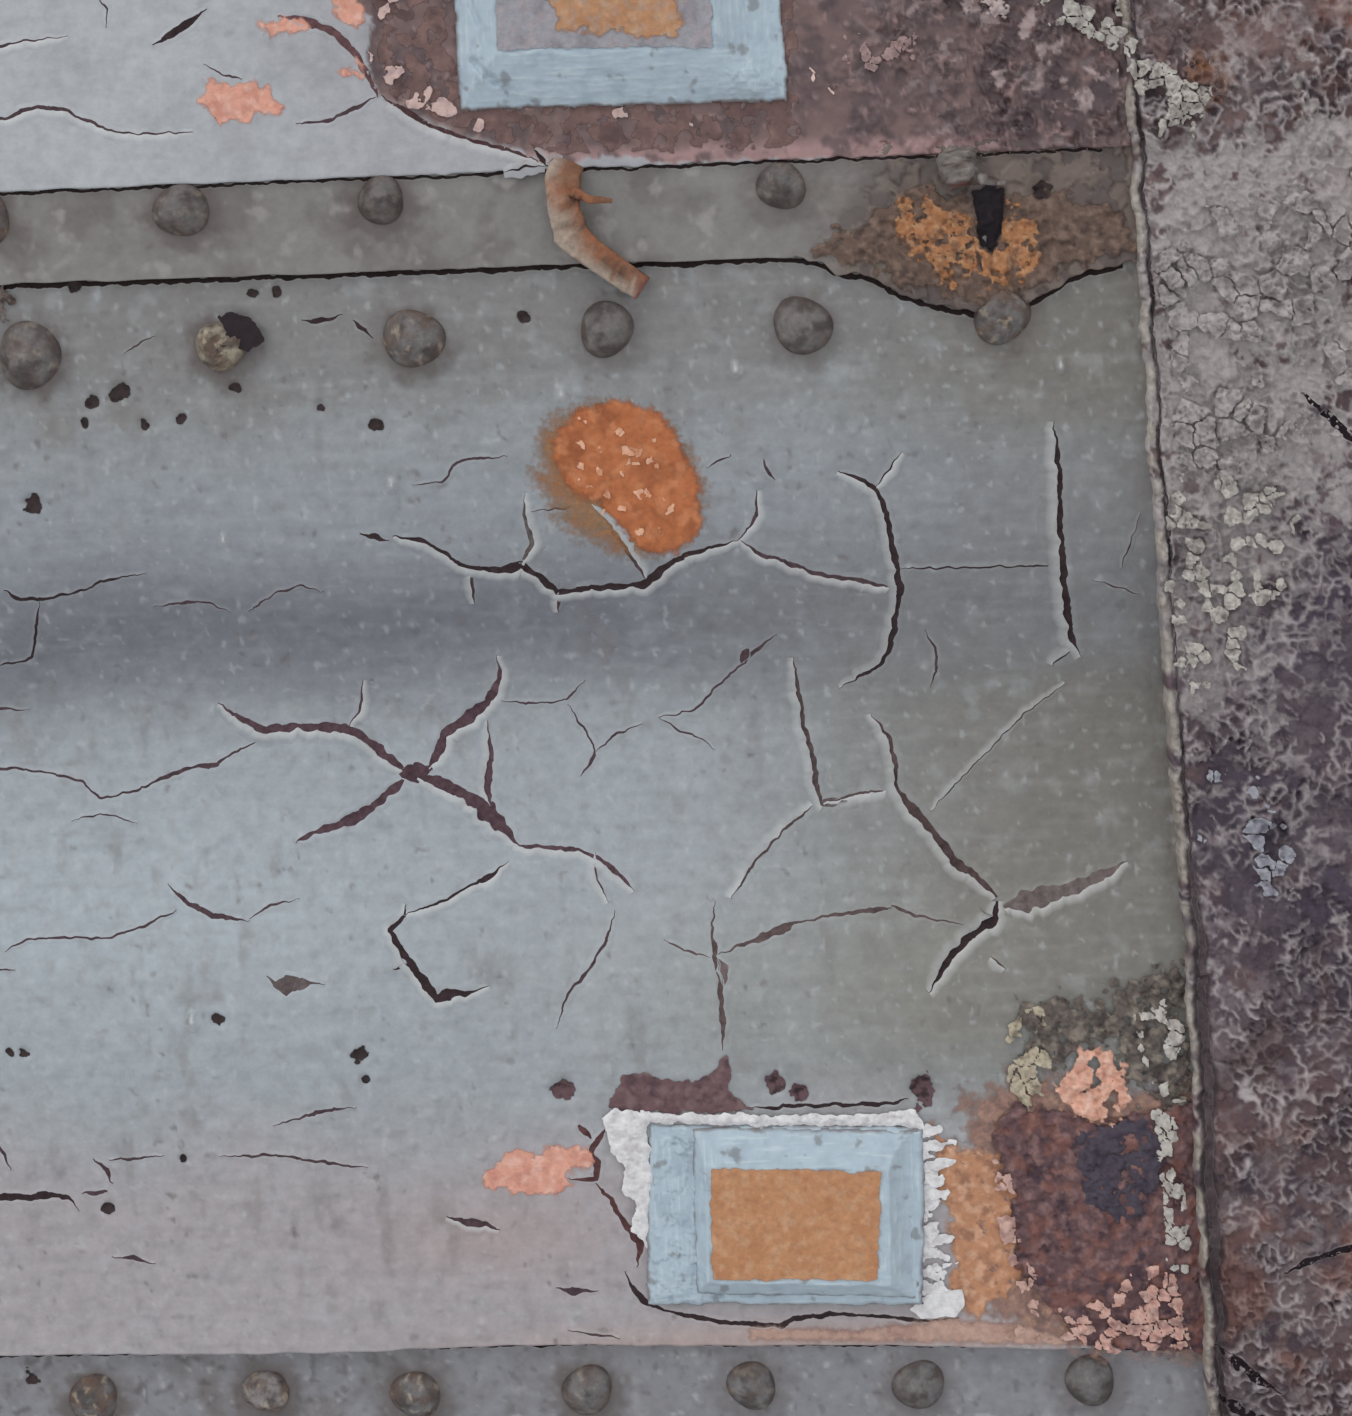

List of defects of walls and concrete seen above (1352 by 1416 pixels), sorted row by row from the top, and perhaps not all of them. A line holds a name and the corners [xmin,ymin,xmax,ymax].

crack [0,101,217,145]
crack [151,6,243,82]
peeling [197,78,285,125]
crack [277,11,382,128]
corrosion [1185,54,1225,108]
crack [0,145,939,198]
corrosion [536,399,702,553]
crack [0,421,1143,1050]
spalling [549,1079,575,1100]
peeling [483,1145,595,1195]
peeling [602,1055,935,1249]
corrosion [750,1074,1205,1366]